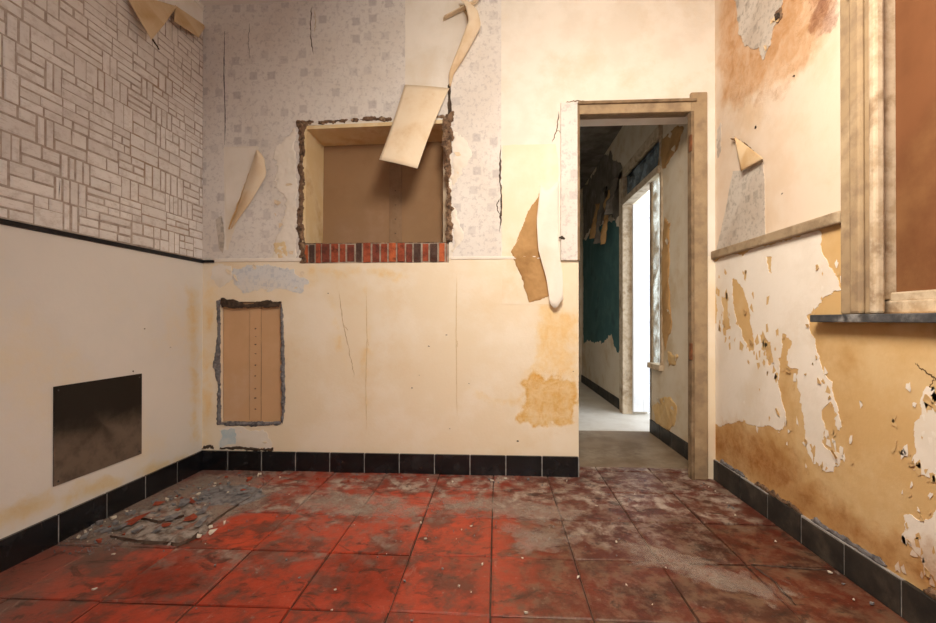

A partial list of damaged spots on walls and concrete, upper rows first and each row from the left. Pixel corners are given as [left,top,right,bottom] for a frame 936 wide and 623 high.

flaking render [770,7,783,24]
flaking render [436,111,472,252]
peeling [658,125,684,169]
flaking render [211,116,392,450]
peeling [661,218,679,367]
peeling [715,231,854,474]
peeling [652,397,677,430]
peeling [890,385,936,497]
flaking render [720,459,907,575]
peeling [901,507,936,600]